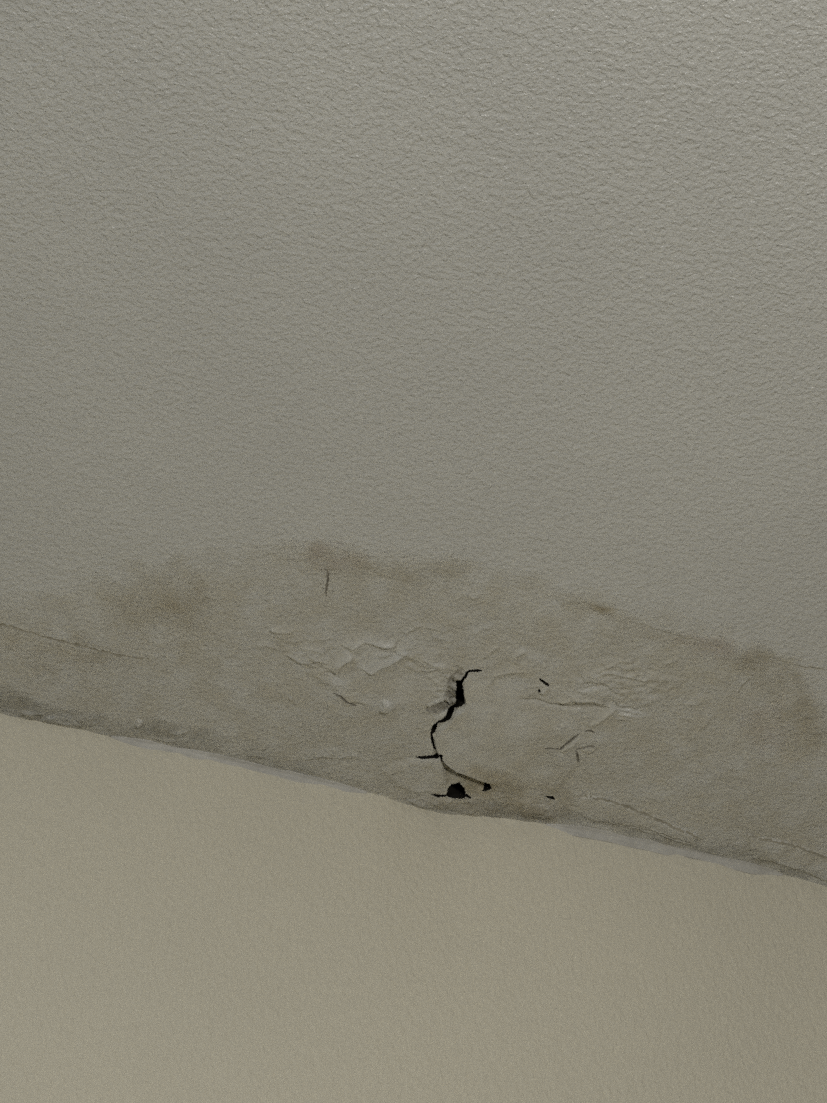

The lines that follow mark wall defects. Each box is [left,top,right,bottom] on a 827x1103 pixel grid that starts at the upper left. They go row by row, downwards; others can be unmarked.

spalling [425,668,467,726]
crack [416,669,482,782]
spalling [444,763,491,793]